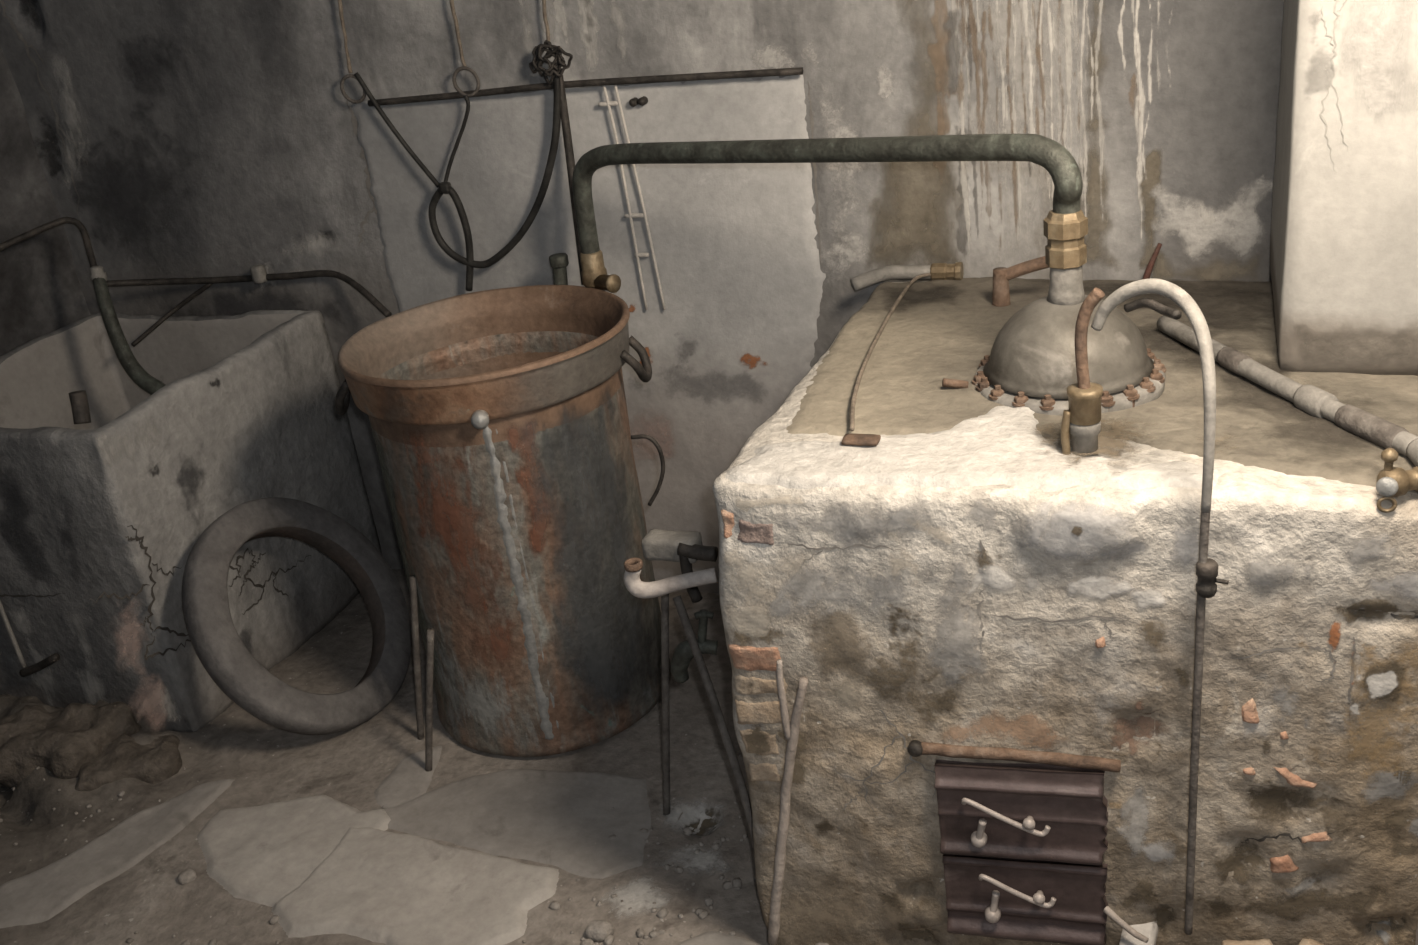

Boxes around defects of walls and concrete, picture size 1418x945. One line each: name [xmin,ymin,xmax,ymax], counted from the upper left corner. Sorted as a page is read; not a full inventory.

damp [752,45,816,69]
damp [821,102,856,138]
damp [907,0,1112,263]
damp [1084,0,1261,328]
damp [824,161,982,269]
peeling [1153,179,1273,257]
damp [891,286,953,306]
crack [230,548,311,615]
peeling [724,555,770,638]
crack [1390,612,1418,620]
peeling [1350,671,1398,714]